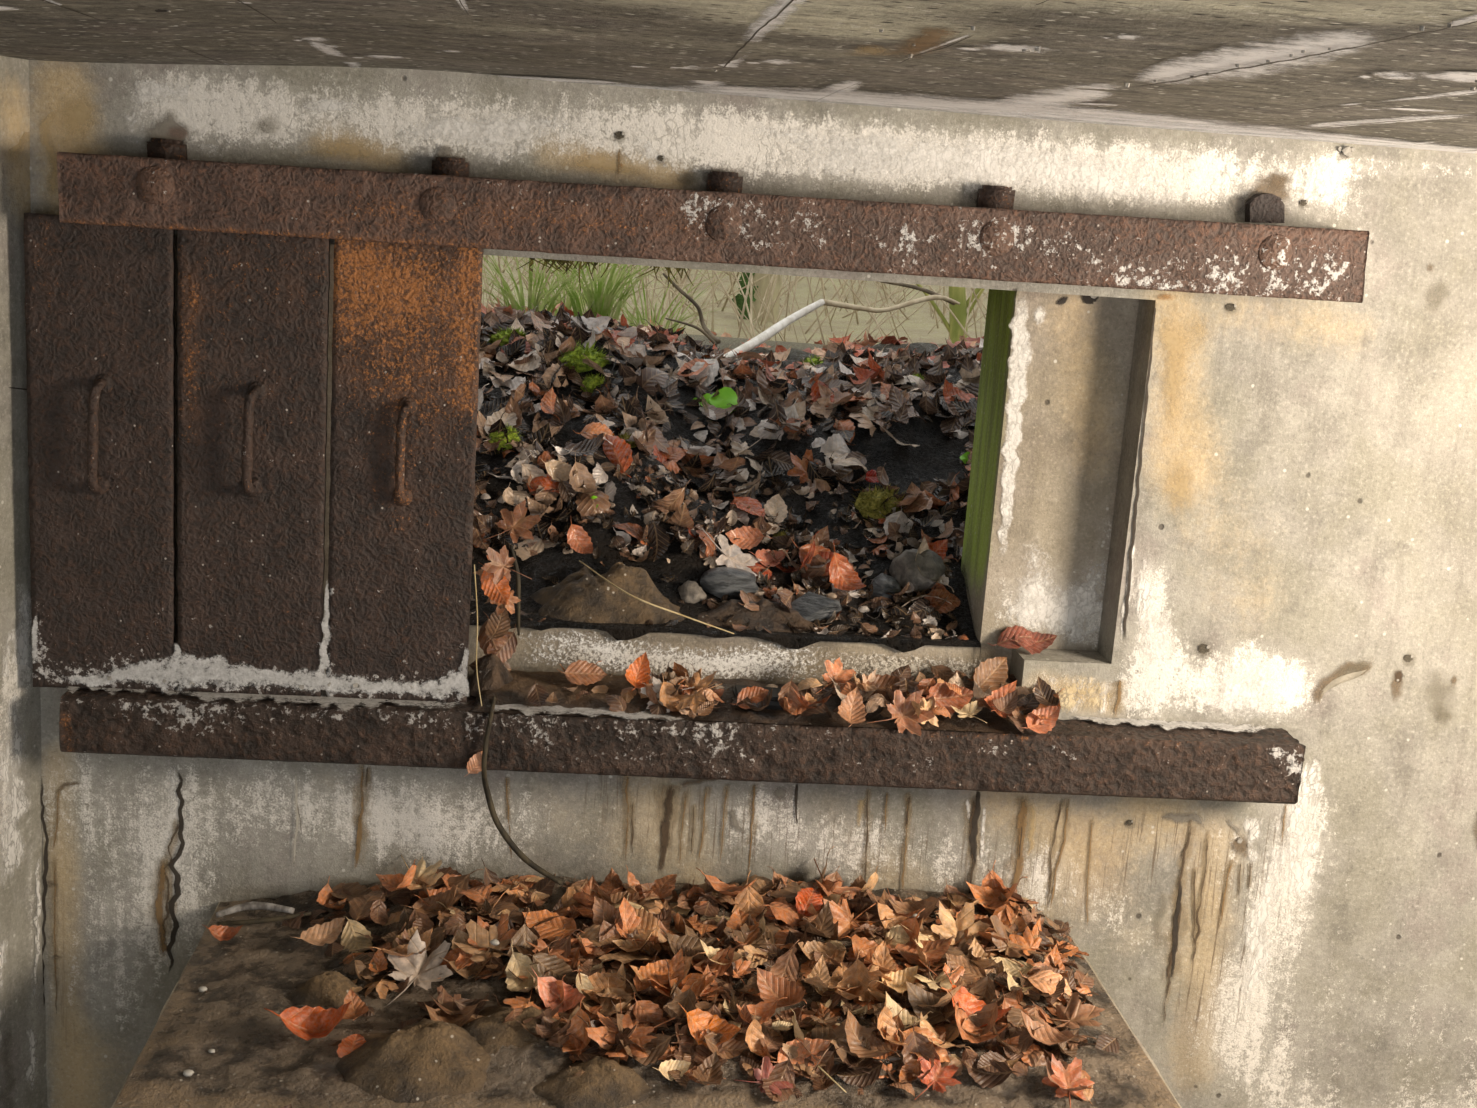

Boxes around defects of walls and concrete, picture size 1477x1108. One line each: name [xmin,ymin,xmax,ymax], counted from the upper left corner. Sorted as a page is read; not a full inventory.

crack [1121,306,1156,637]
water stain [3,593,38,677]
water stain [67,585,469,712]
water stain [489,704,682,721]
water stain [0,695,41,996]
crack [155,770,185,972]
water stain [730,787,755,874]
water stain [774,784,798,823]
water stain [966,791,986,893]
water stain [26,1030,36,1085]